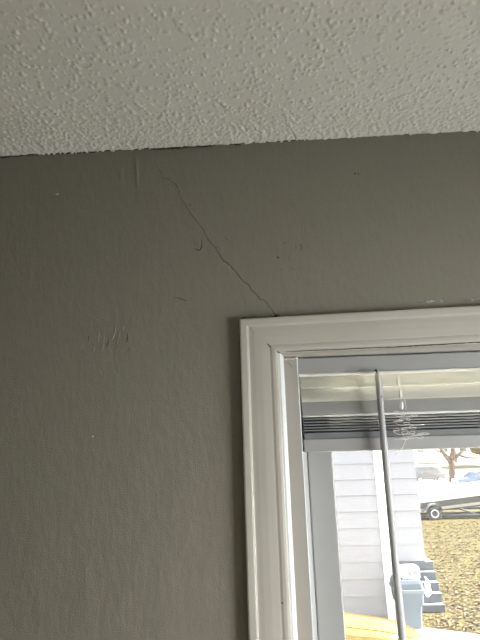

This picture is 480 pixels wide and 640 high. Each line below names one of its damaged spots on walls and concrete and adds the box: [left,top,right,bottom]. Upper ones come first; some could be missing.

crack [157,166,275,416]